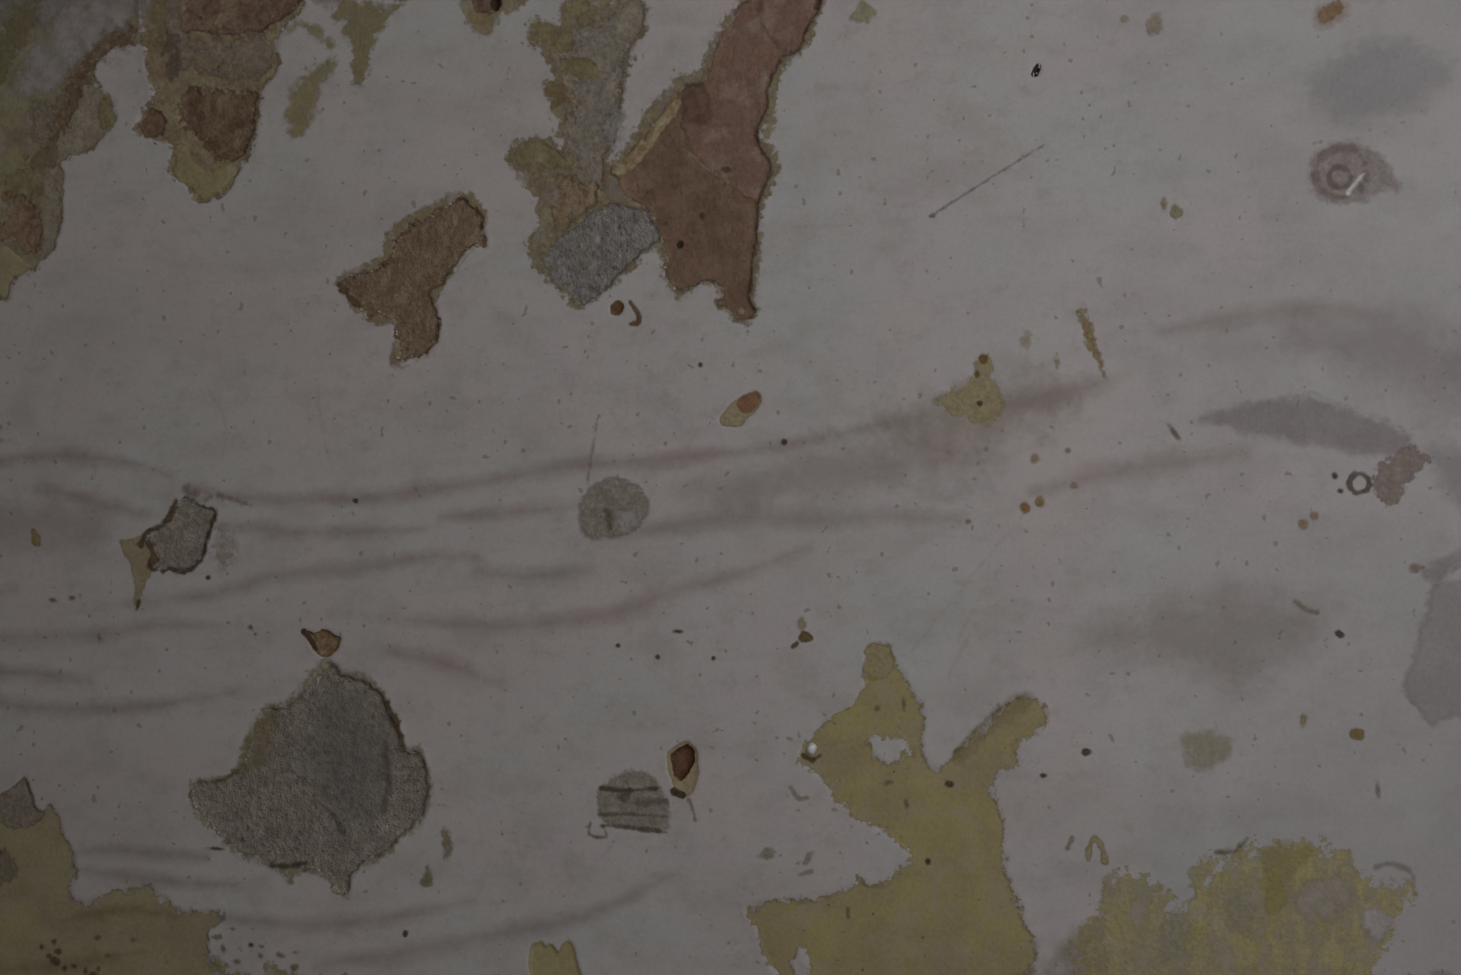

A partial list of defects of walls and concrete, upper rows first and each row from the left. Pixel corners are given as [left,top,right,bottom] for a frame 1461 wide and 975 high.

spalling [461,0,527,35]
peeling [0,0,306,301]
spalling [505,0,825,326]
spalling [336,192,487,367]
spalling [120,496,216,609]
peeling [0,777,298,975]
spalling [189,629,432,896]
peeling [528,940,581,975]
peeling [747,643,1048,975]
peeling [1066,836,1108,865]